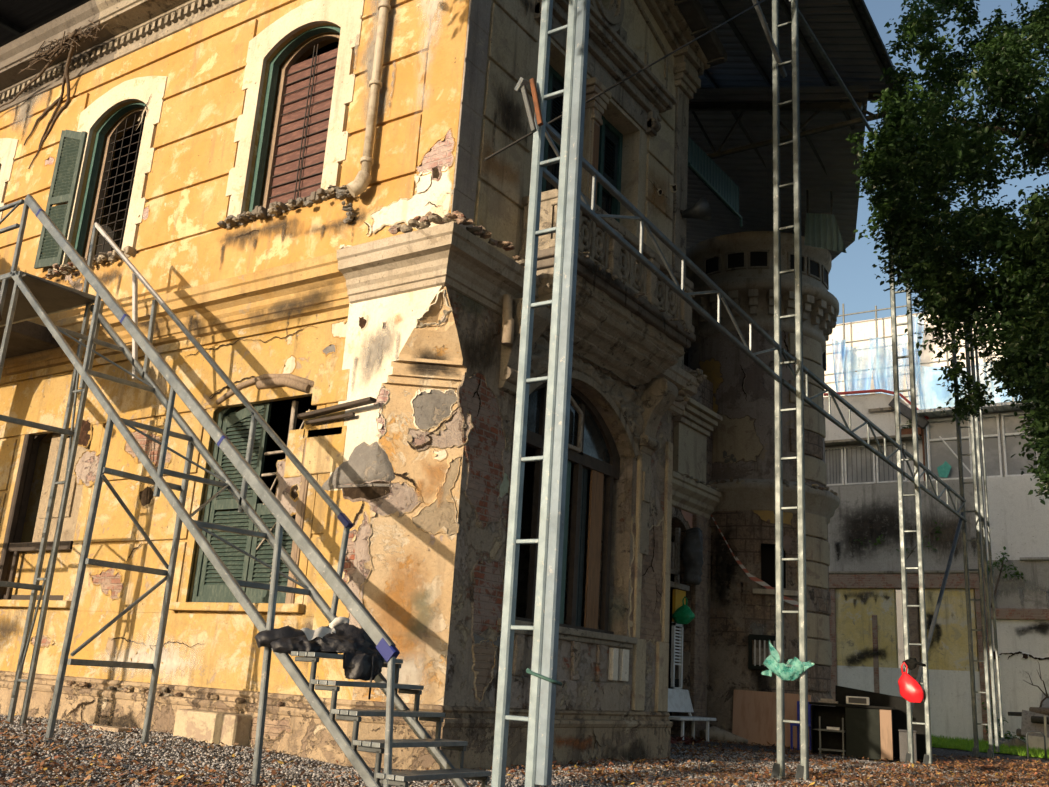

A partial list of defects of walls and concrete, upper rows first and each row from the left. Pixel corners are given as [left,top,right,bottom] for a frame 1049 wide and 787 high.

leakage [486,92,528,178]
spalling [217,185,356,226]
peeling [370,128,525,267]
spalling [124,430,173,468]
crack [393,376,481,492]
spalling [342,371,510,605]
leakage [835,505,976,560]
spalling [89,568,125,601]
leakage [0,621,16,639]
spalling [471,557,506,702]
leakage [846,649,886,666]
crack [999,651,1049,660]